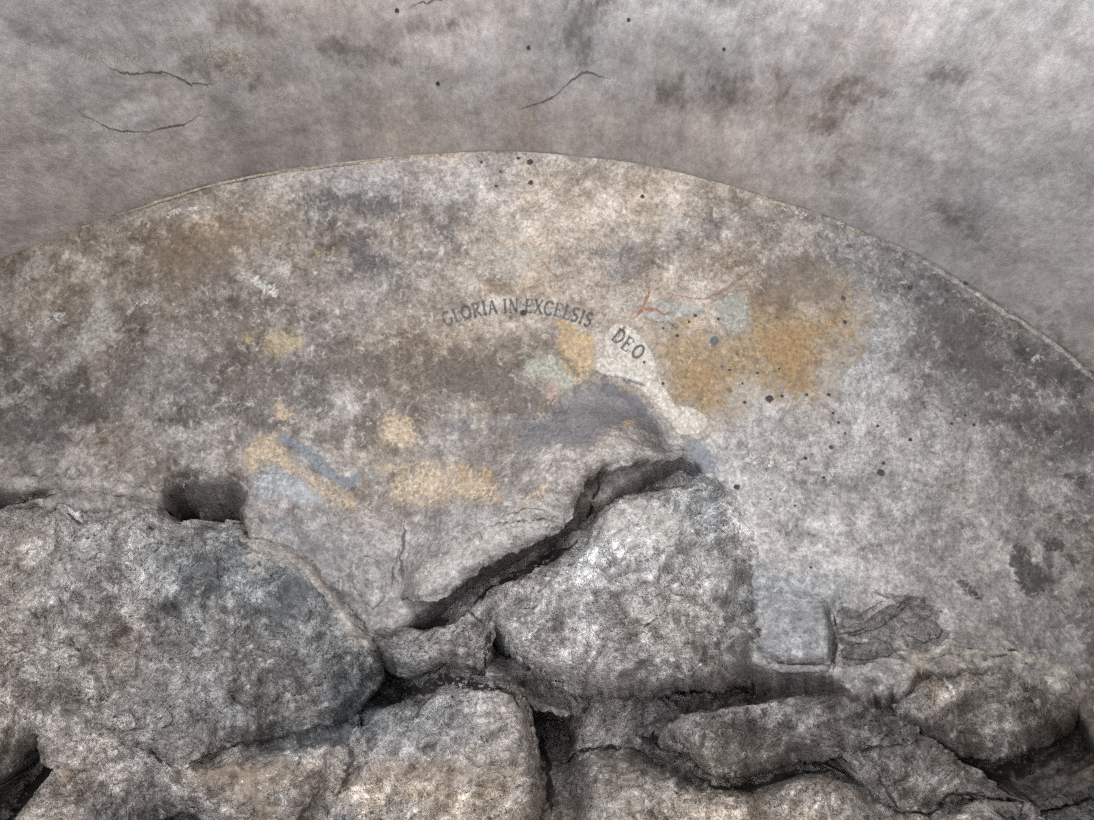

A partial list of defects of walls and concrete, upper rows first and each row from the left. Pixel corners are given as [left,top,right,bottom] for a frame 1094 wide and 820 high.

corrosion [660,255,855,414]
crack [12,493,81,524]
crack [494,508,552,526]
crack [586,466,605,520]
flaking render [0,465,377,651]
crack [391,518,406,586]
crack [468,611,495,668]
crack [779,593,913,672]
crack [137,708,173,768]
crack [296,743,355,820]
crack [547,744,658,766]
crack [931,791,1043,820]